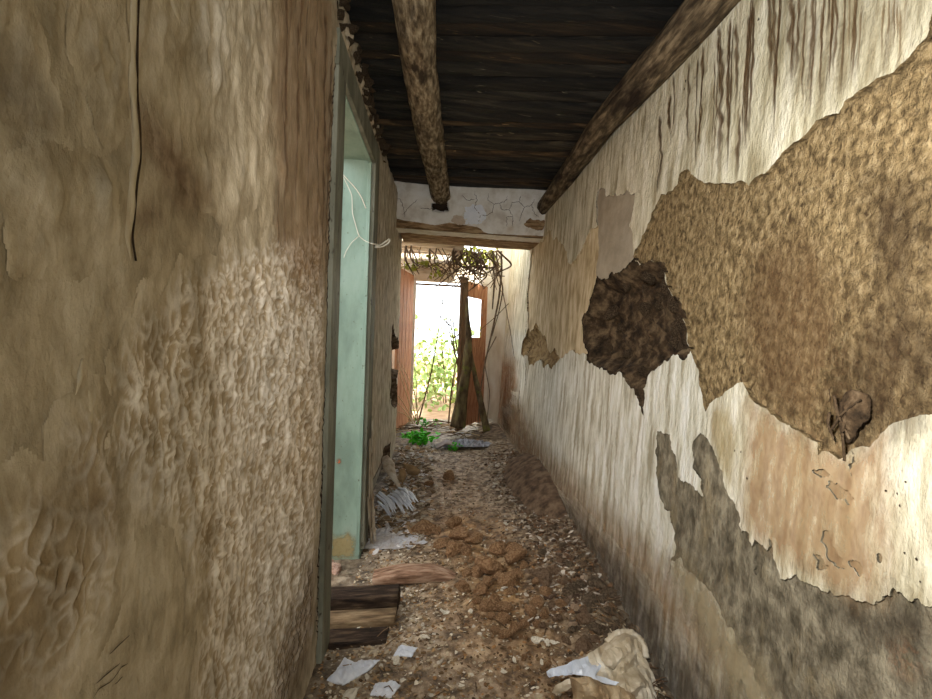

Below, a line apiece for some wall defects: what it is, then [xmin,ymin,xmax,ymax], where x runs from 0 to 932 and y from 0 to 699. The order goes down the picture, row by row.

leakage [658,79,675,175]
leakage [686,0,755,163]
leakage [767,0,861,99]
leakage [881,0,901,53]
spalling [521,14,932,477]
spalling [390,324,399,408]
leakage [565,508,699,699]